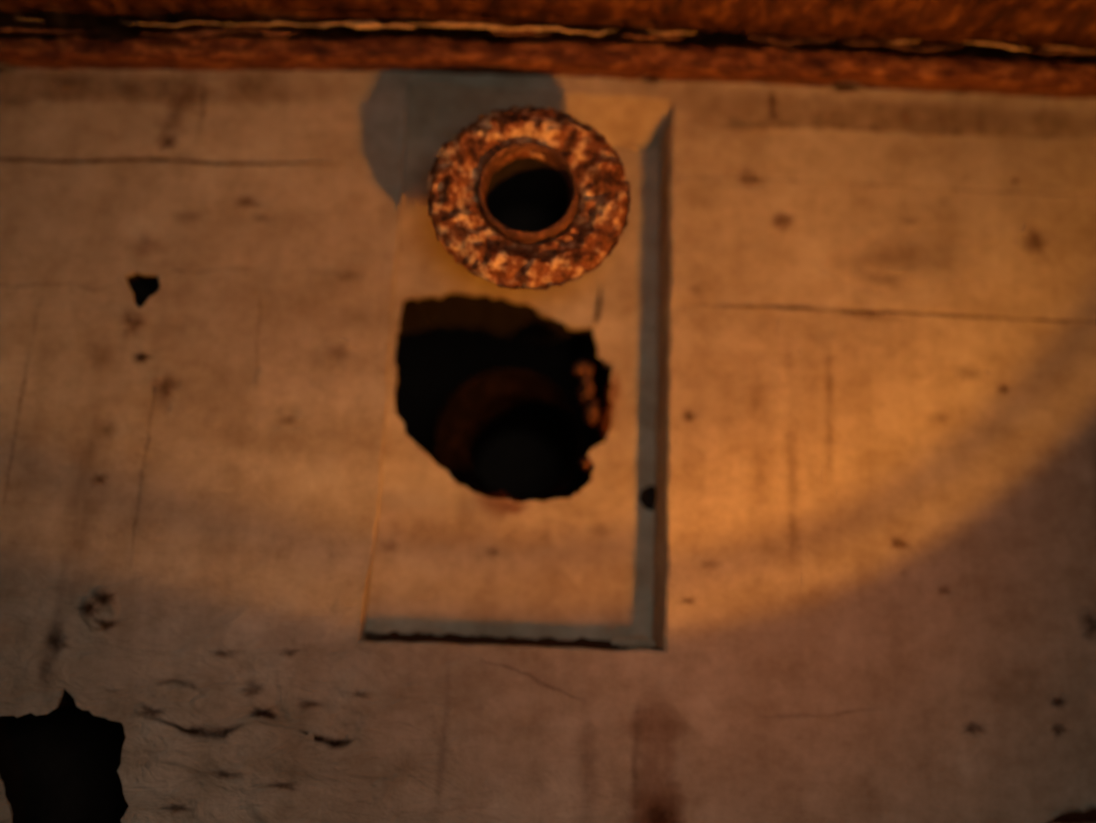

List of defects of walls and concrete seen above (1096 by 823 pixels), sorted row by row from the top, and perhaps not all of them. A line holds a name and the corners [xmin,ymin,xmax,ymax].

spalling [125,271,160,308]
spalling [0,688,129,823]